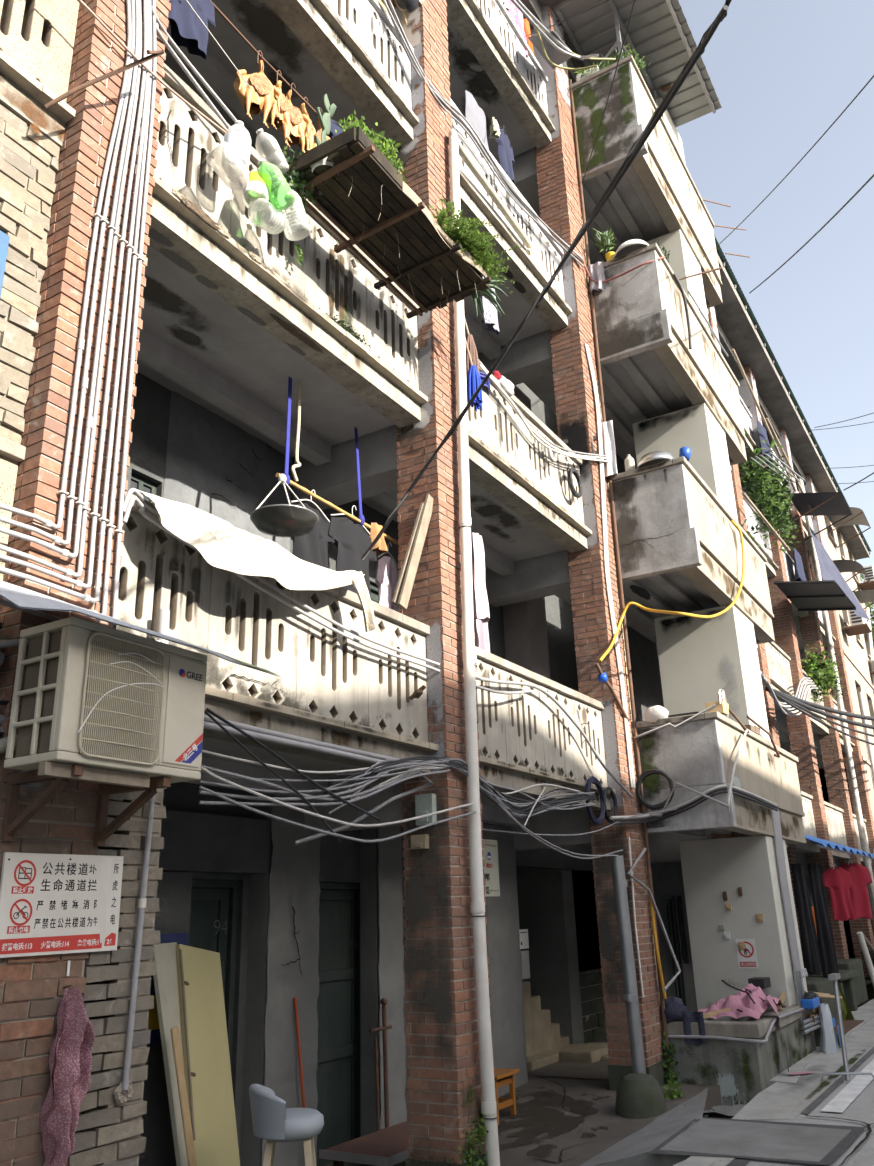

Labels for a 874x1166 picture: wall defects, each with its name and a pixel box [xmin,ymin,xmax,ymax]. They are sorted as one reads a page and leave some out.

leakage [233,0,303,97]
leakage [573,63,636,174]
leakage [143,276,205,348]
leakage [612,475,674,573]
crack [281,906,302,975]